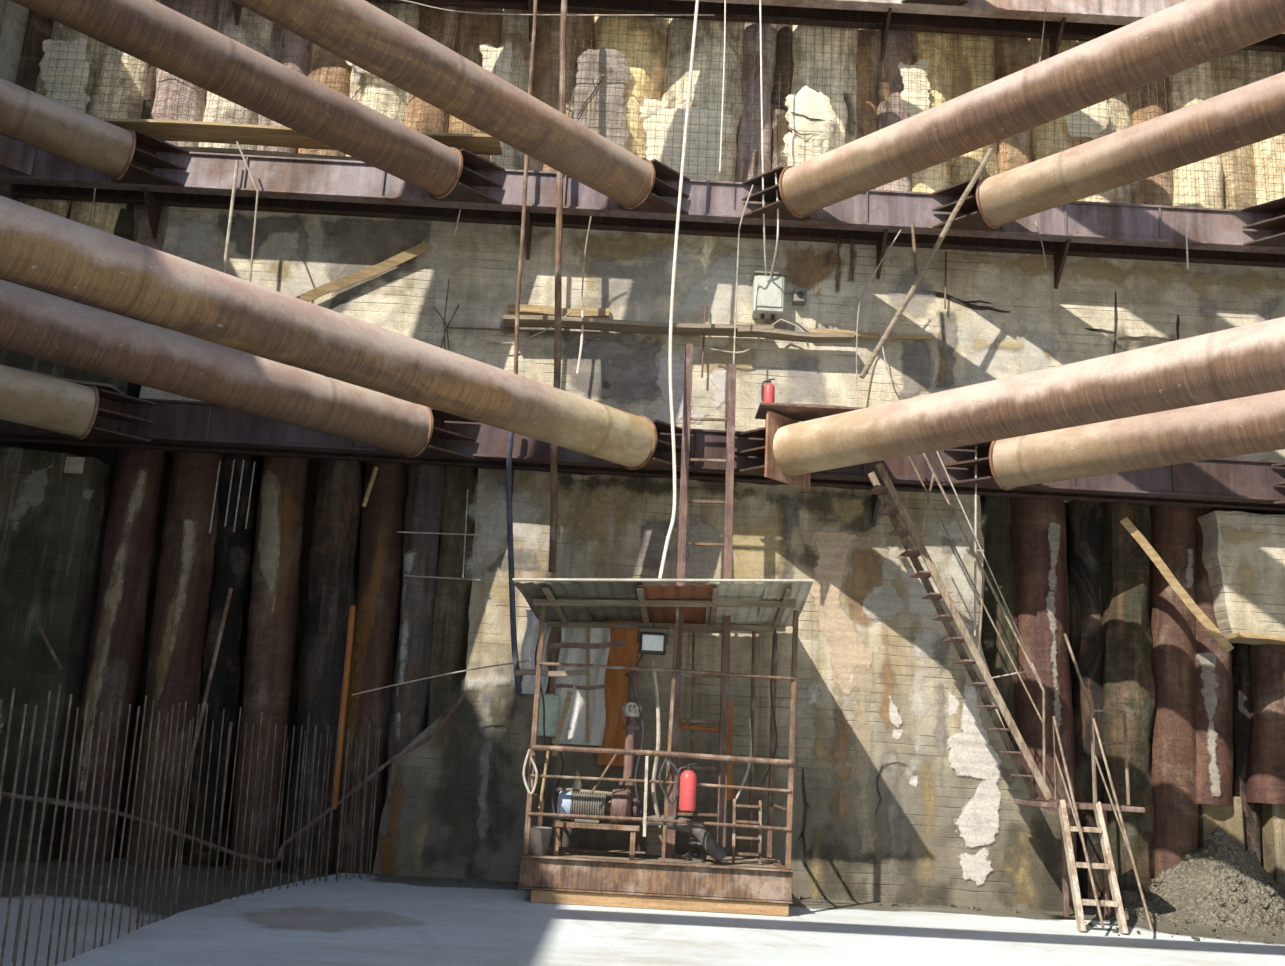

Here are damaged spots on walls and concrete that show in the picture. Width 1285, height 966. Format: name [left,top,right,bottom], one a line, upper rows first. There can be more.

spalling [571,48,630,149]
water stain [168,214,430,312]
crack [931,291,1010,313]
water stain [7,464,54,532]
water stain [468,484,547,575]
rust [844,550,882,624]
water stain [412,670,523,879]